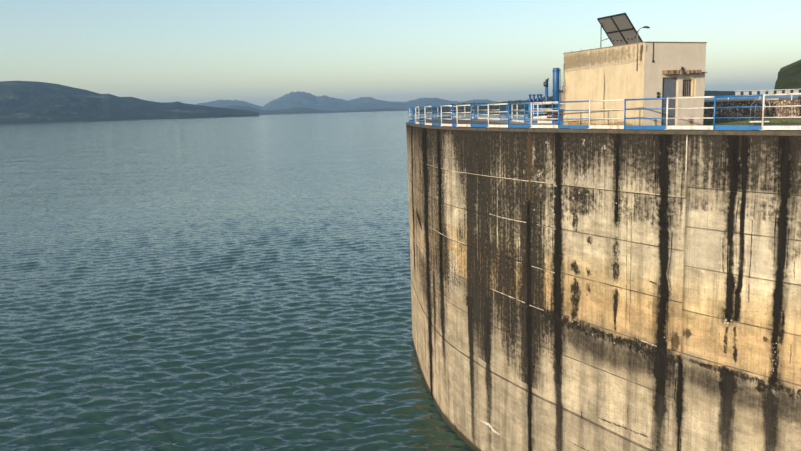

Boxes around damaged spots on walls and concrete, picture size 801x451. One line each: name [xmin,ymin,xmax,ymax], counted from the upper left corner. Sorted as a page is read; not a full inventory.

damp [406,125,801,451]